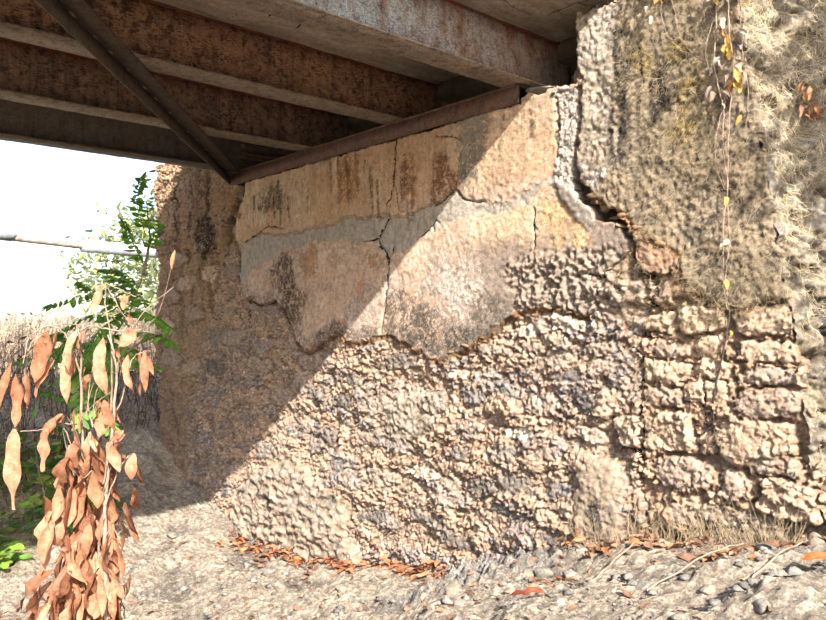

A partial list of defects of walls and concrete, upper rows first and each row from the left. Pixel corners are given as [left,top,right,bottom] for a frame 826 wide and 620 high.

peeling [577,8,615,60]
crack [205,180,282,311]
leakage [253,180,290,218]
crack [365,139,400,328]
crack [420,178,485,237]
spalling [551,85,790,317]
flaking render [246,296,591,367]
crack [578,181,674,464]